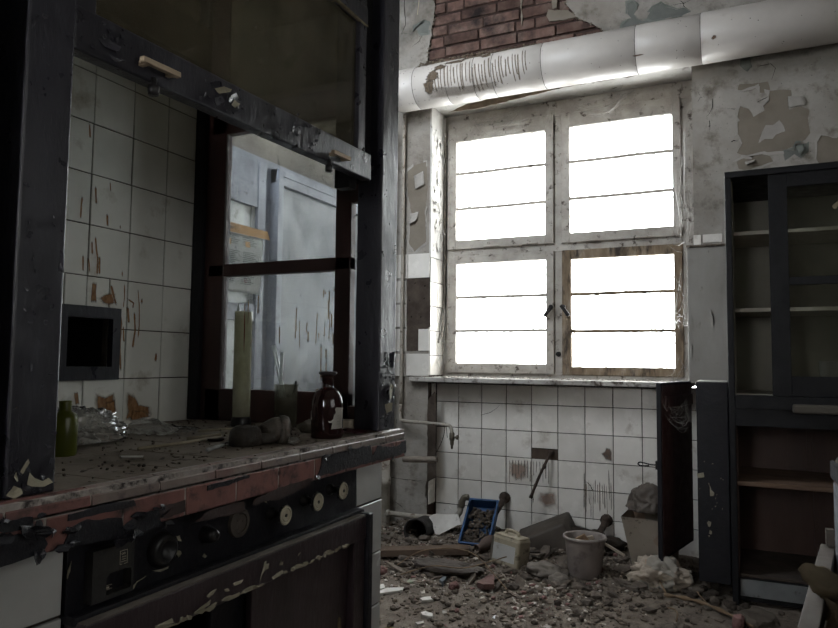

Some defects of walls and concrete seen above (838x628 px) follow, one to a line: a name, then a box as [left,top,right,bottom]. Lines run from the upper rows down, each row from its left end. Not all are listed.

flaking render [412,0,603,61]
peeling [620,0,691,28]
peeling [740,55,764,72]
peeling [733,82,838,170]
corrosion [82,238,143,369]
water stain [584,471,612,514]